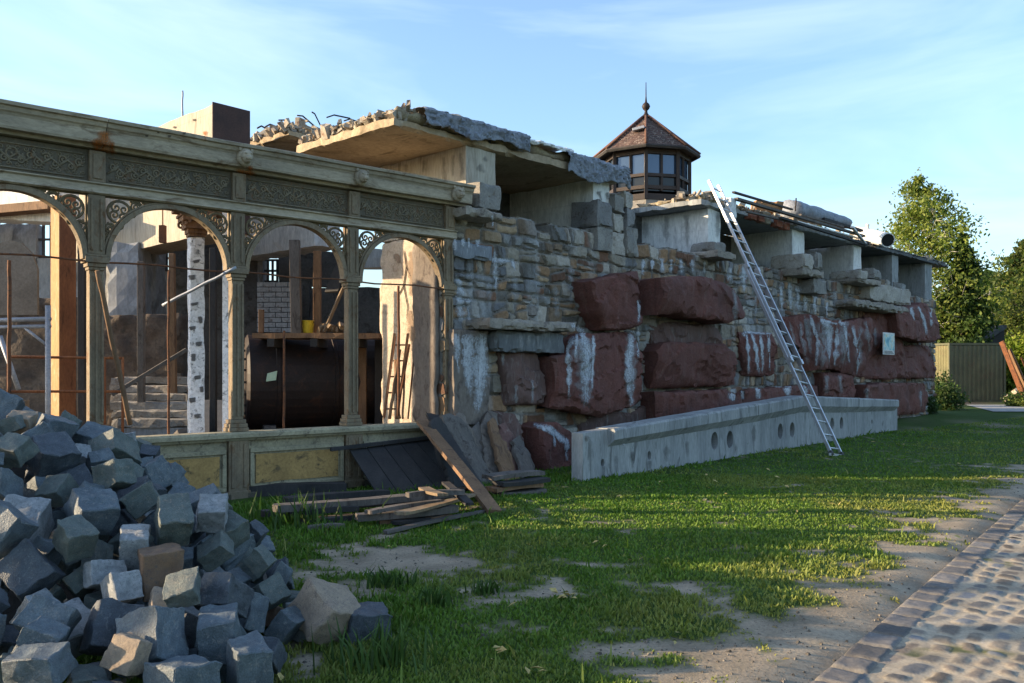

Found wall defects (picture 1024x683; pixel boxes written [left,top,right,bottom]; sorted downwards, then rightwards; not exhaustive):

rust [92,131,114,154]
leakage [453,334,489,409]
leakage [565,323,596,400]
leakage [624,301,640,403]
leakage [743,331,771,370]
leakage [779,283,869,371]
leakage [534,424,569,453]